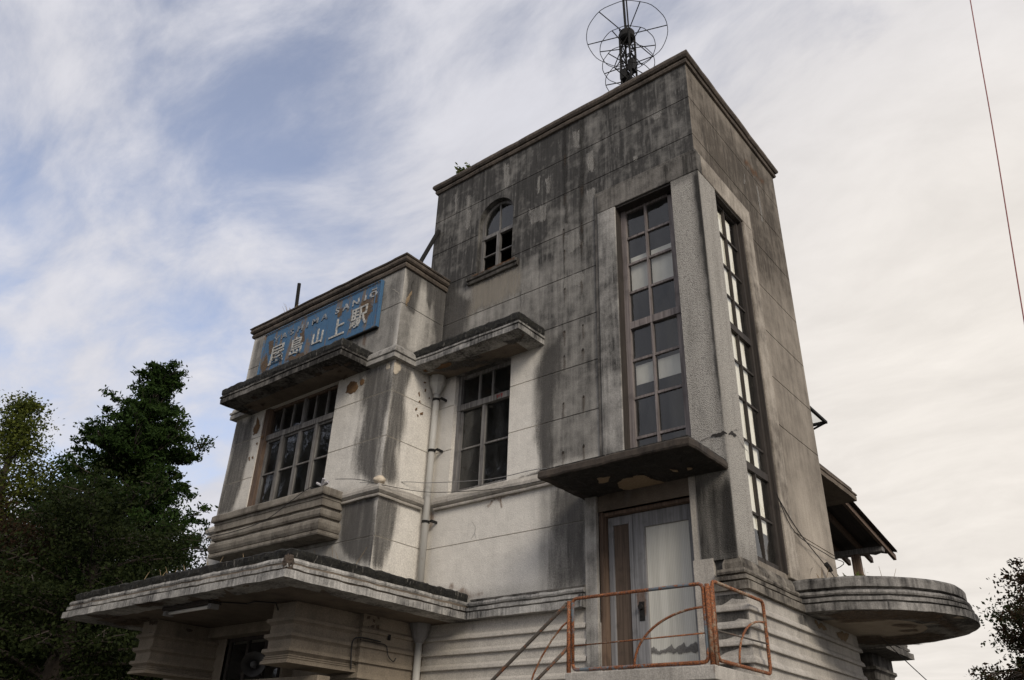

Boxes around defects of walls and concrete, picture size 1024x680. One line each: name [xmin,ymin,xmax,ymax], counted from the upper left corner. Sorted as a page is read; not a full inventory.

damp [562,119,595,252]
damp [407,269,524,343]
peeling [346,379,365,394]
damp [355,363,411,484]
damp [521,335,723,588]
peeling [597,475,665,490]
crack [701,429,749,454]
damp [341,497,397,568]